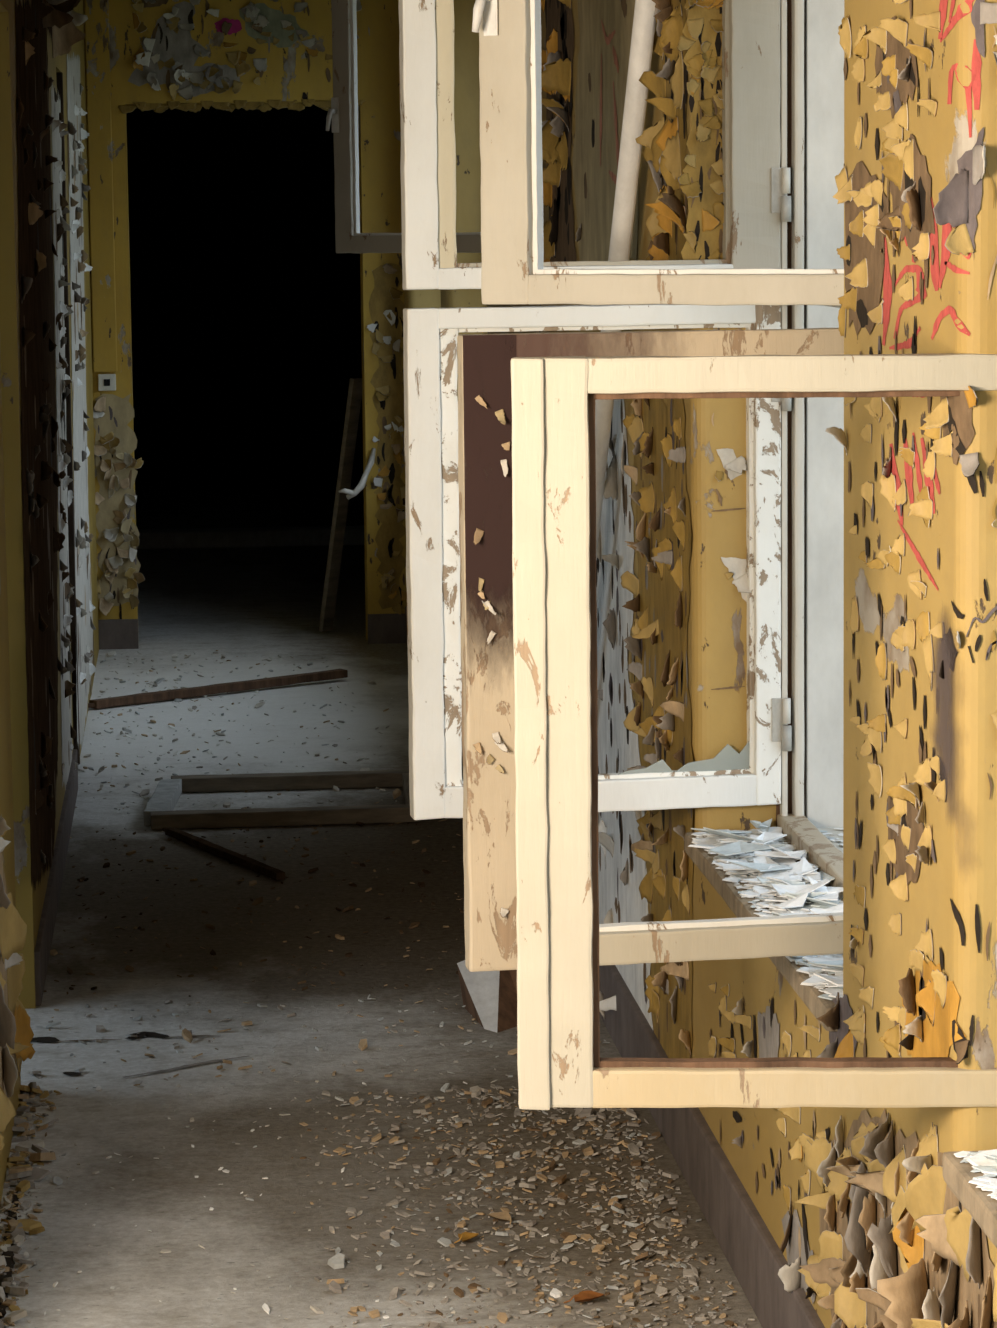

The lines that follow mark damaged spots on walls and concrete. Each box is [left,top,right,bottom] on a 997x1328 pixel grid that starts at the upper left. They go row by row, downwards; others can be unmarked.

flaking render [128,0,333,101]
flaking render [541,0,725,262]
peeling [833,0,986,355]
peeling [15,0,145,890]
peeling [366,263,407,615]
peeling [596,399,693,774]
peeling [716,448,746,480]
peeling [721,557,753,602]
peeling [598,569,939,936]
peeling [825,385,985,528]
peeling [0,817,35,1153]
peeling [599,921,969,1064]